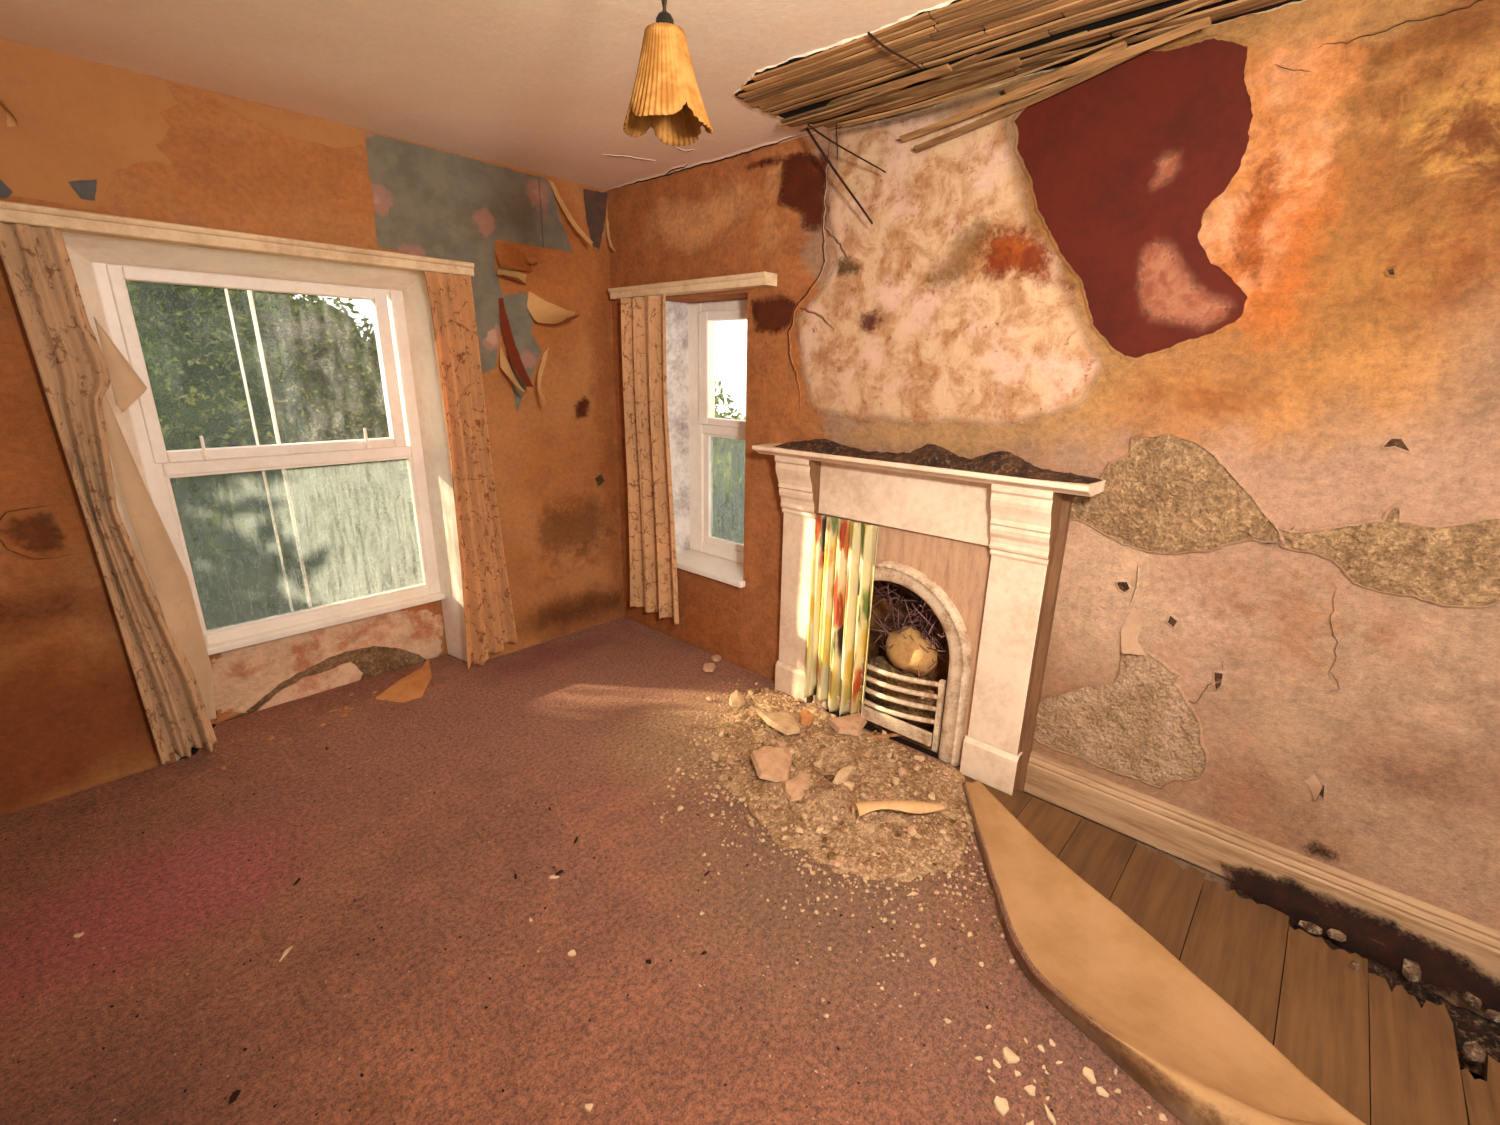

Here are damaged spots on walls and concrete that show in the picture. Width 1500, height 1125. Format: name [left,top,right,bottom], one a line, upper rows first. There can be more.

peeling [797,34,1258,427]
damp [1,513,63,551]
flaking render [1069,431,1500,609]
flaking render [212,640,429,724]
flaking render [1033,579,1210,789]
damp [1222,865,1500,1012]